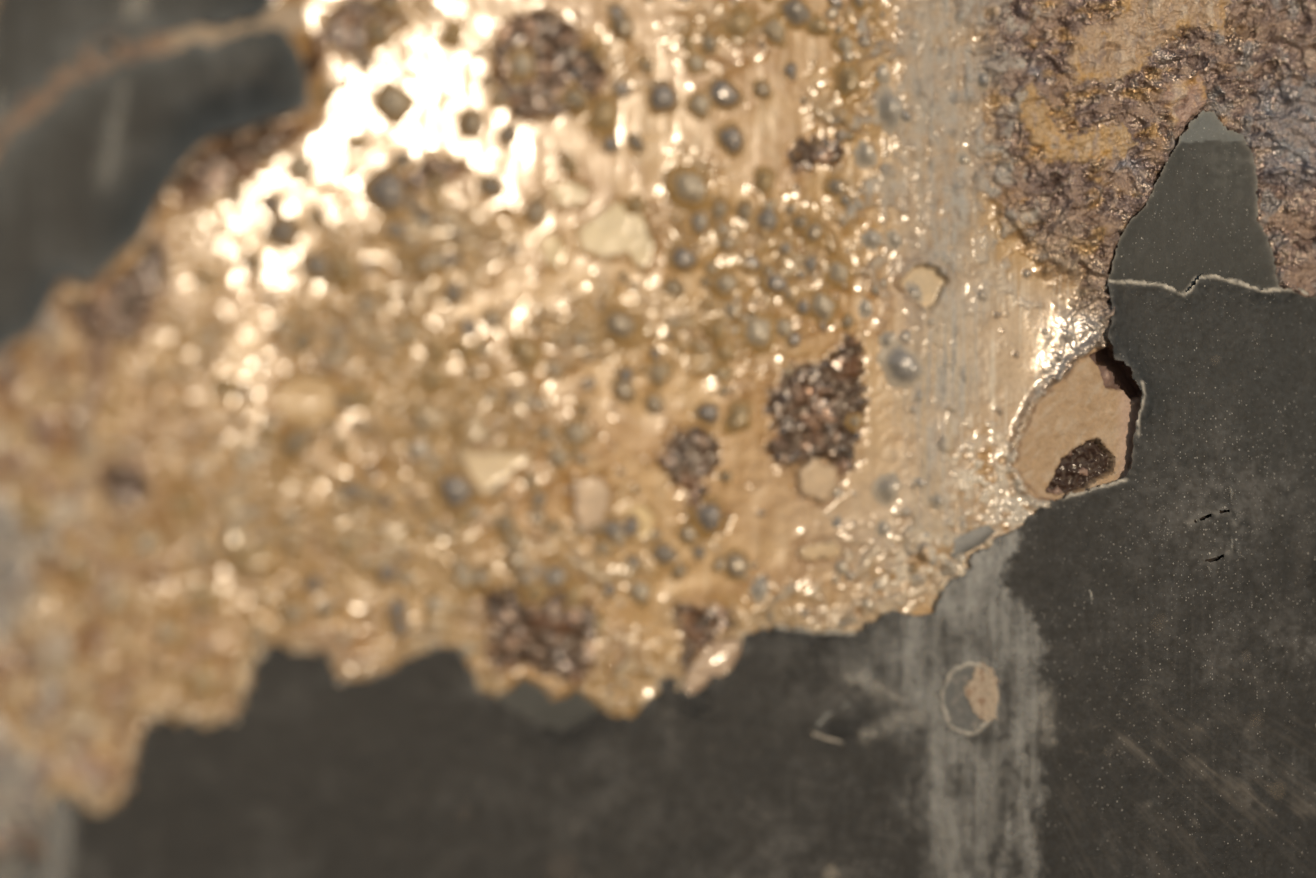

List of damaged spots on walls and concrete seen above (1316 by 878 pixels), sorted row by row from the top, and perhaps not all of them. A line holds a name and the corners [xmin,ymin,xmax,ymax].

peeling [971,0,1316,356]
peeling [0,0,1107,814]
leakage [833,0,1047,865]
spalling [1014,348,1142,502]
leakage [0,745,60,833]